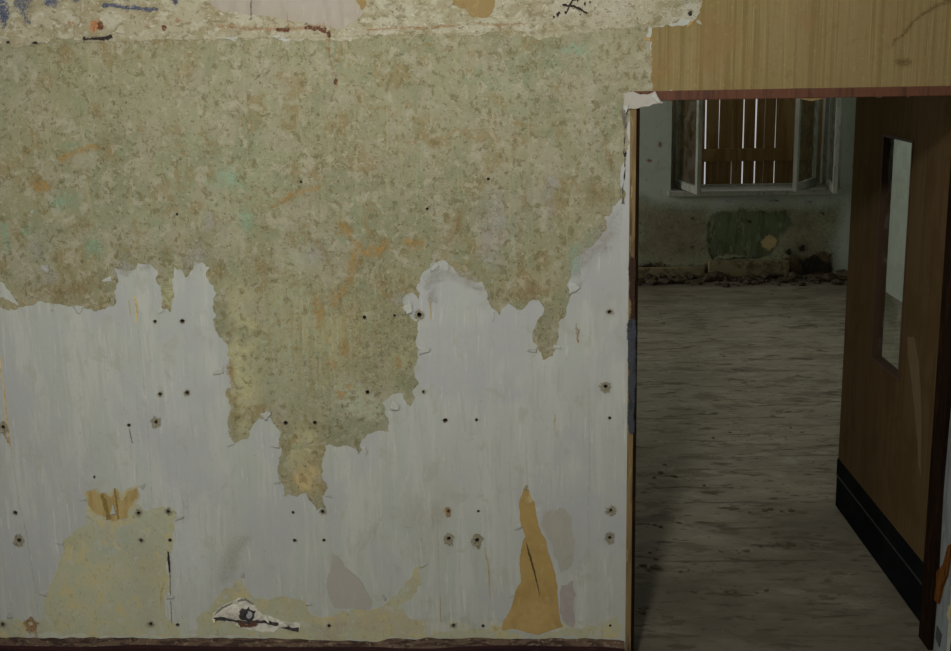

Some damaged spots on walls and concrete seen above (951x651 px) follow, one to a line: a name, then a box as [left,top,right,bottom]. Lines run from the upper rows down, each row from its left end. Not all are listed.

peeling [0,0,703,516]
peeling [0,484,183,638]
peeling [194,485,623,642]